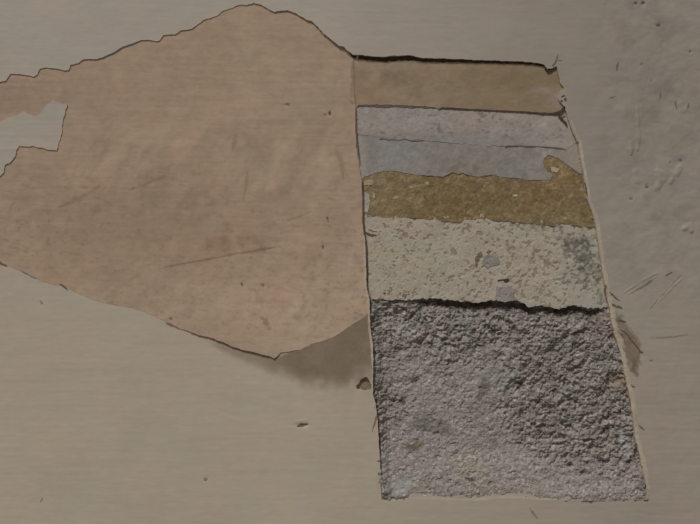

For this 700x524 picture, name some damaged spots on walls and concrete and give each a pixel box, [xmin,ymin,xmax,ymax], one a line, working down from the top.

peeling [0,3,564,381]
damp [276,315,373,380]
crack [350,53,567,162]
spalling [356,106,650,501]